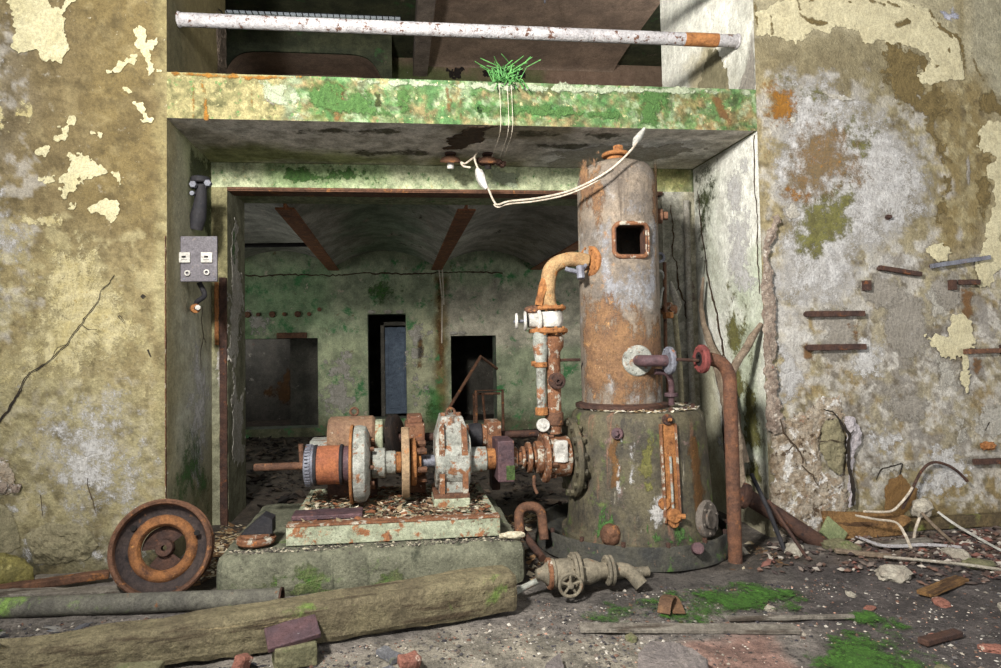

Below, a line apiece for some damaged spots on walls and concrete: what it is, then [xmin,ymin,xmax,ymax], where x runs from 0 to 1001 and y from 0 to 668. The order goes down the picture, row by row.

peeling [6,0,76,64]
peeling [106,25,162,76]
water stain [260,80,347,134]
water stain [353,149,428,157]
water stain [517,130,619,150]
water stain [725,67,931,314]
peeling [754,0,1001,288]
crack [670,205,687,319]
crack [697,191,726,358]
crack [0,275,115,422]
spalling [760,203,849,534]
crack [719,411,727,457]